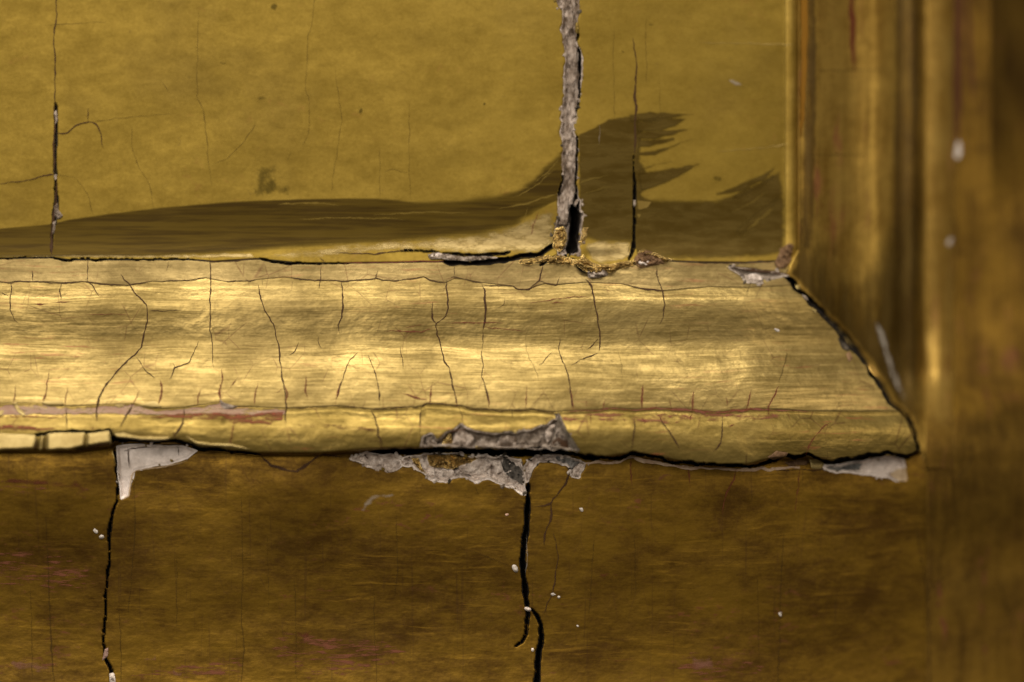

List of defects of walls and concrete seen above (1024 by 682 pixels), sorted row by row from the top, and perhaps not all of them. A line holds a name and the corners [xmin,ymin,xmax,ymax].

crack [0,0,921,507]
spalling [726,264,789,286]
spalling [116,442,198,500]
spalling [348,413,589,496]
spalling [822,455,907,482]
crack [102,407,339,682]
crack [512,469,571,682]